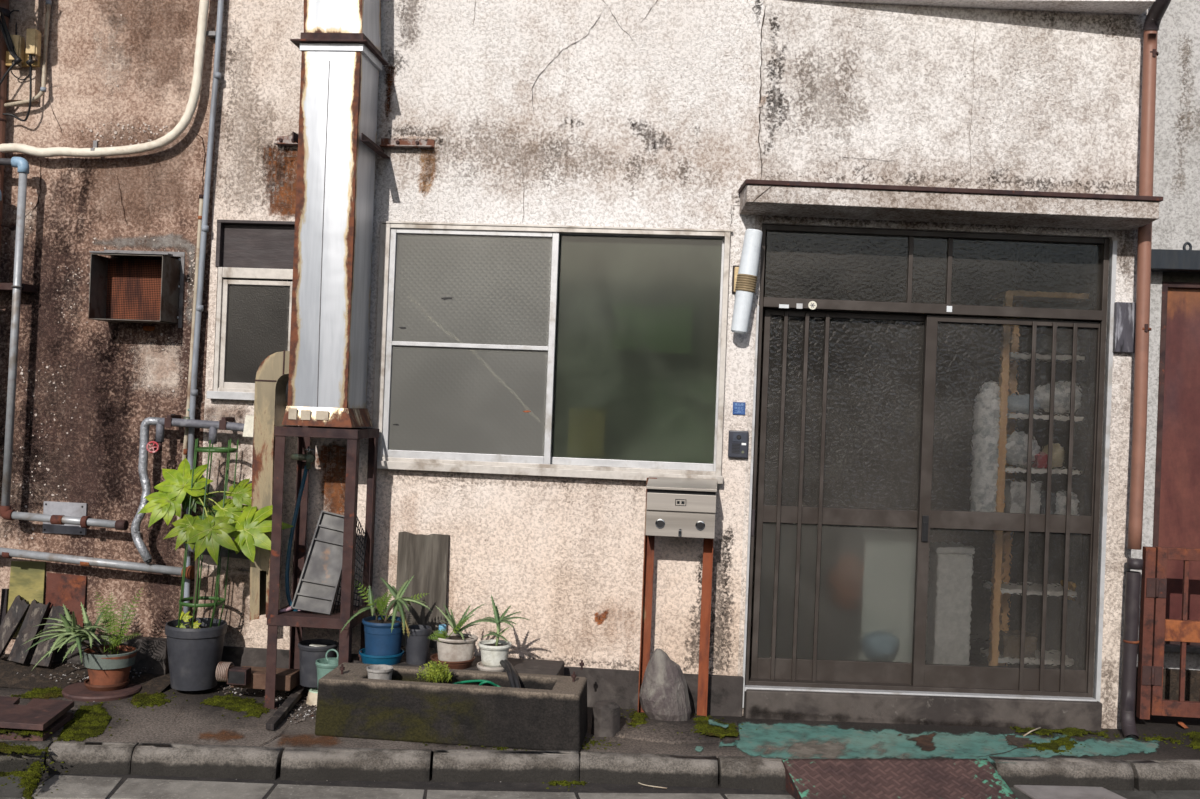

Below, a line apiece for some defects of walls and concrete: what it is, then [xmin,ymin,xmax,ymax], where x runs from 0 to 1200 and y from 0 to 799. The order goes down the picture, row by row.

rust [262,145,298,217]
rust [419,147,436,193]
crack [505,145,525,221]
crack [532,0,658,109]
leakage [632,122,671,150]
crack [730,0,772,226]
leakage [764,48,785,154]
leakage [0,164,140,539]
rust [316,442,347,515]
leakage [685,531,733,671]